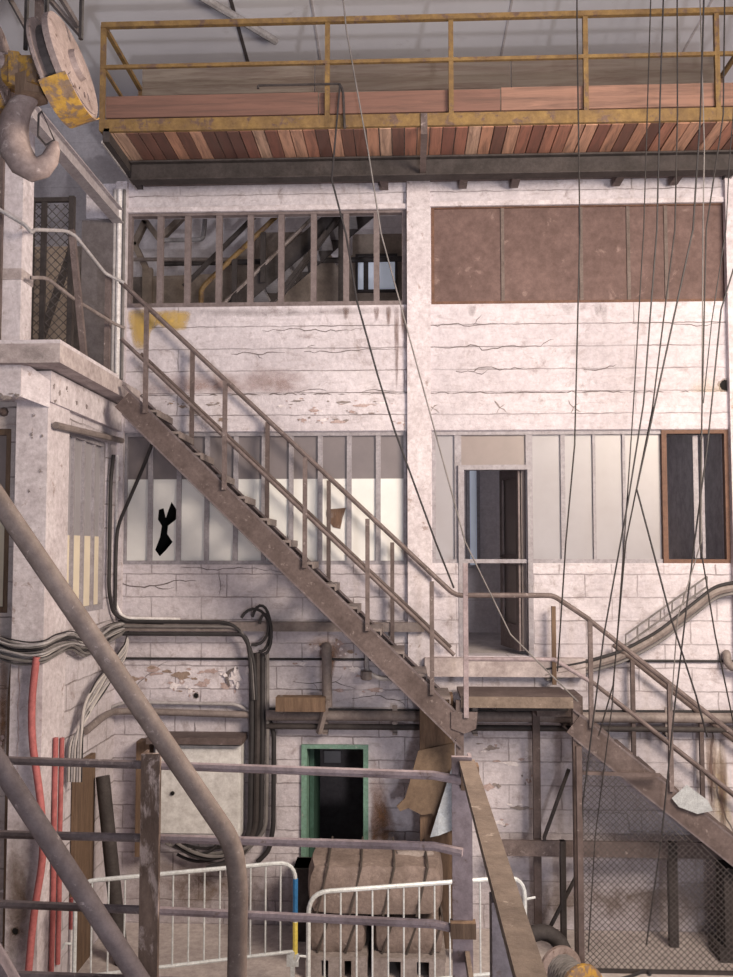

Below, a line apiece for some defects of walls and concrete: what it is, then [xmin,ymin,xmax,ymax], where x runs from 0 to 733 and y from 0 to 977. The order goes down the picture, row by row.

crack [234,328,396,359]
leakage [376,311,406,363]
crack [431,317,727,413]
crack [142,388,402,396]
spalling [132,665,236,699]
rust [373,797,390,840]